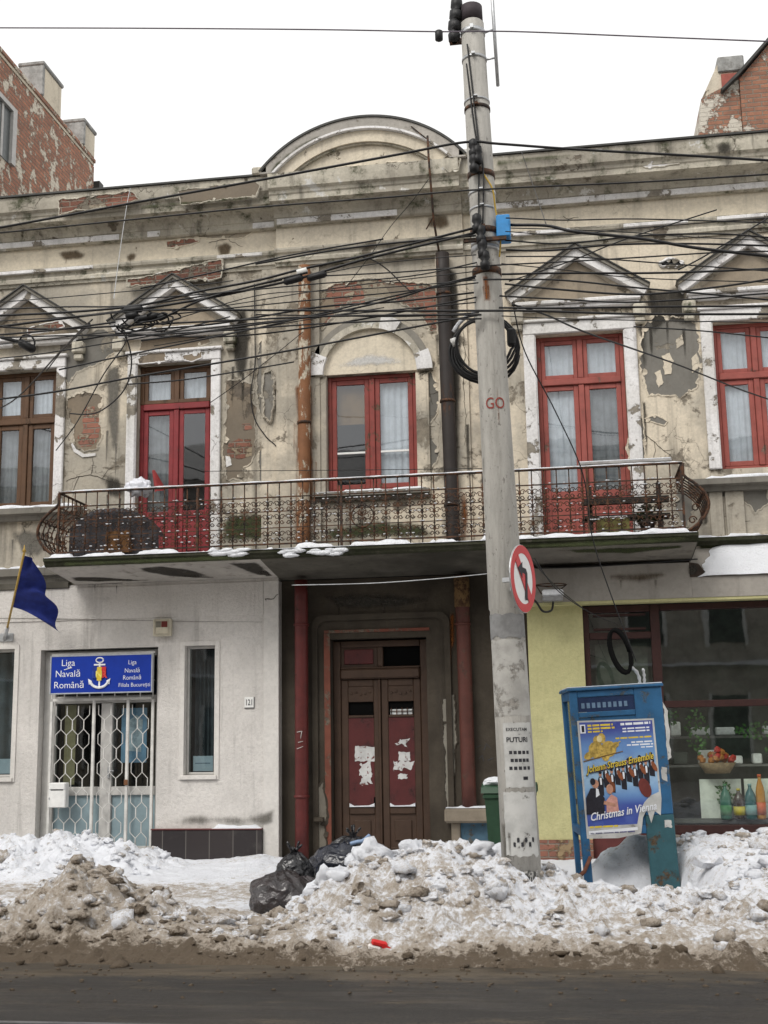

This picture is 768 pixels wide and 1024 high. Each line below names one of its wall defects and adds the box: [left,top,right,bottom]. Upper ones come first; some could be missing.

spalling [57,189,140,215]
spalling [165,232,254,249]
spalling [126,259,224,288]
flaking render [320,276,437,334]
flaking render [638,315,703,401]
flaking render [58,328,119,457]
flaking render [220,339,262,497]
flaking render [743,490,768,516]